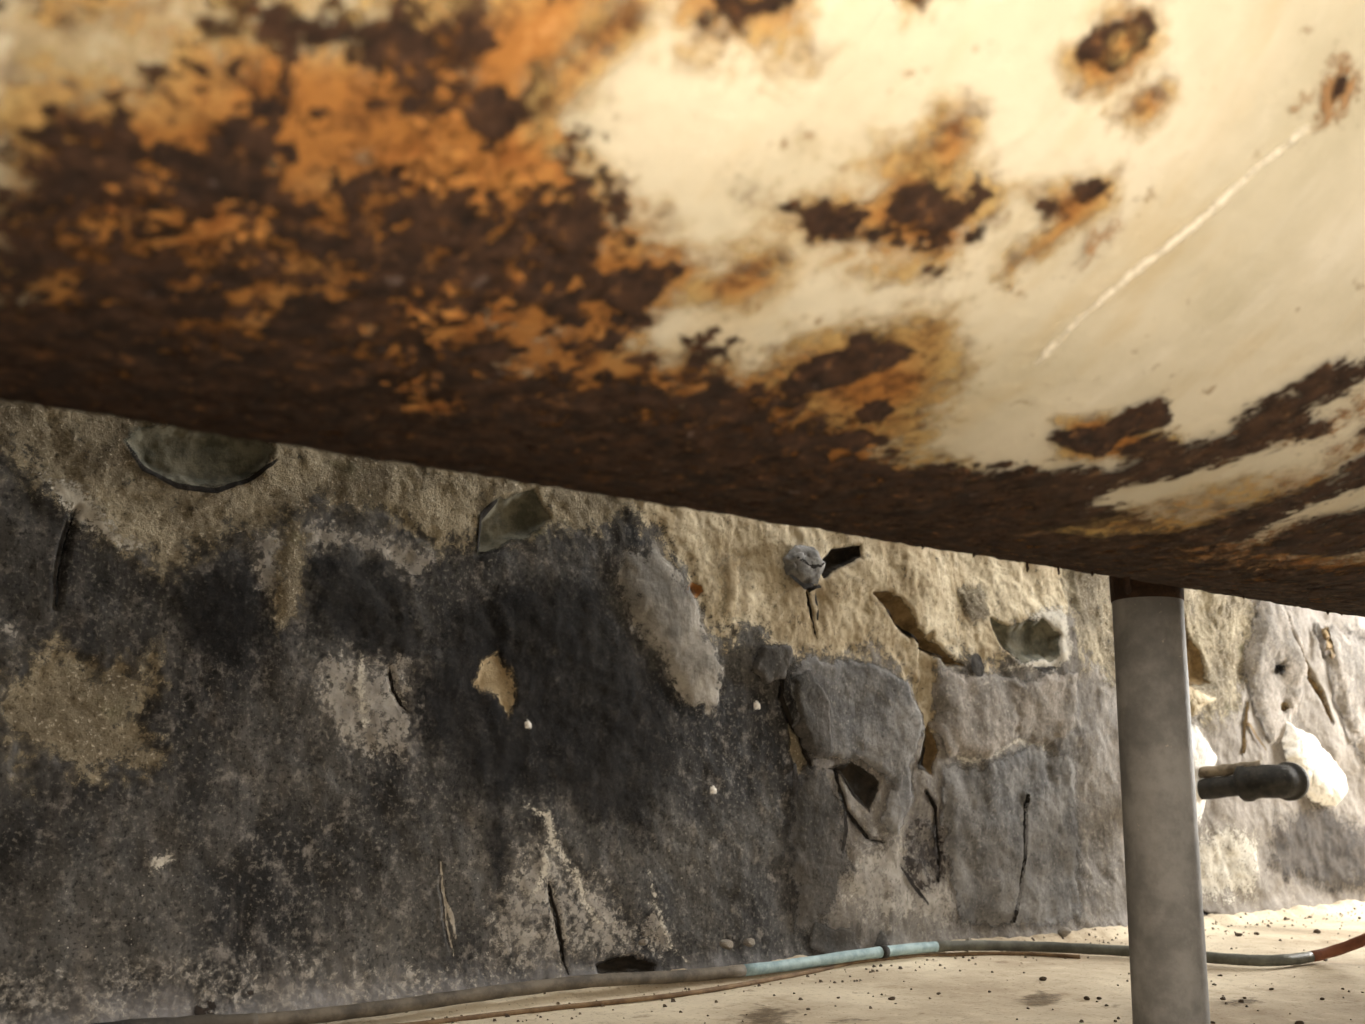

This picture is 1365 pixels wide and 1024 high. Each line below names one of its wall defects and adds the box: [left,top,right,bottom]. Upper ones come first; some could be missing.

rust [0,0,1365,617]
crack [55,515,74,605]
damp [32,468,149,555]
spalling [0,400,1116,954]
spalling [1184,588,1365,760]
damp [0,518,687,1024]
crack [1012,794,1030,923]